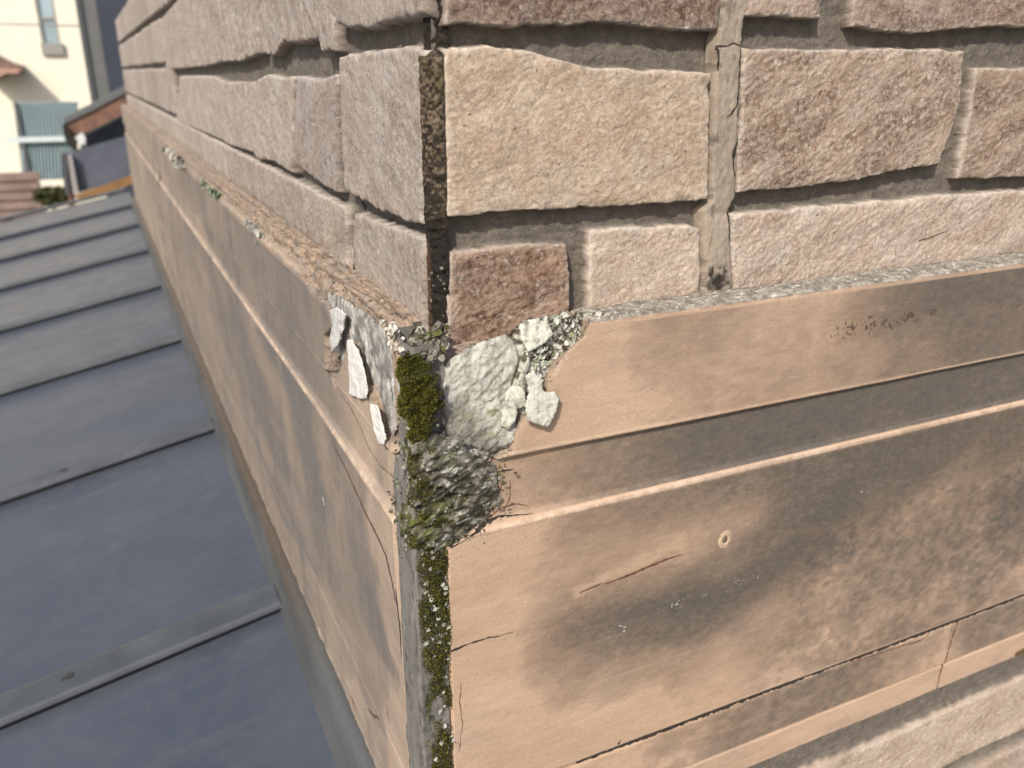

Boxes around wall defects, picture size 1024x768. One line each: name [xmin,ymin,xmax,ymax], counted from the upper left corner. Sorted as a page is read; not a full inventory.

crack [335,448,402,658]
spalling [315,288,613,566]
crack [451,632,512,652]
water stain [570,268,1024,654]
crack [576,594,1024,764]